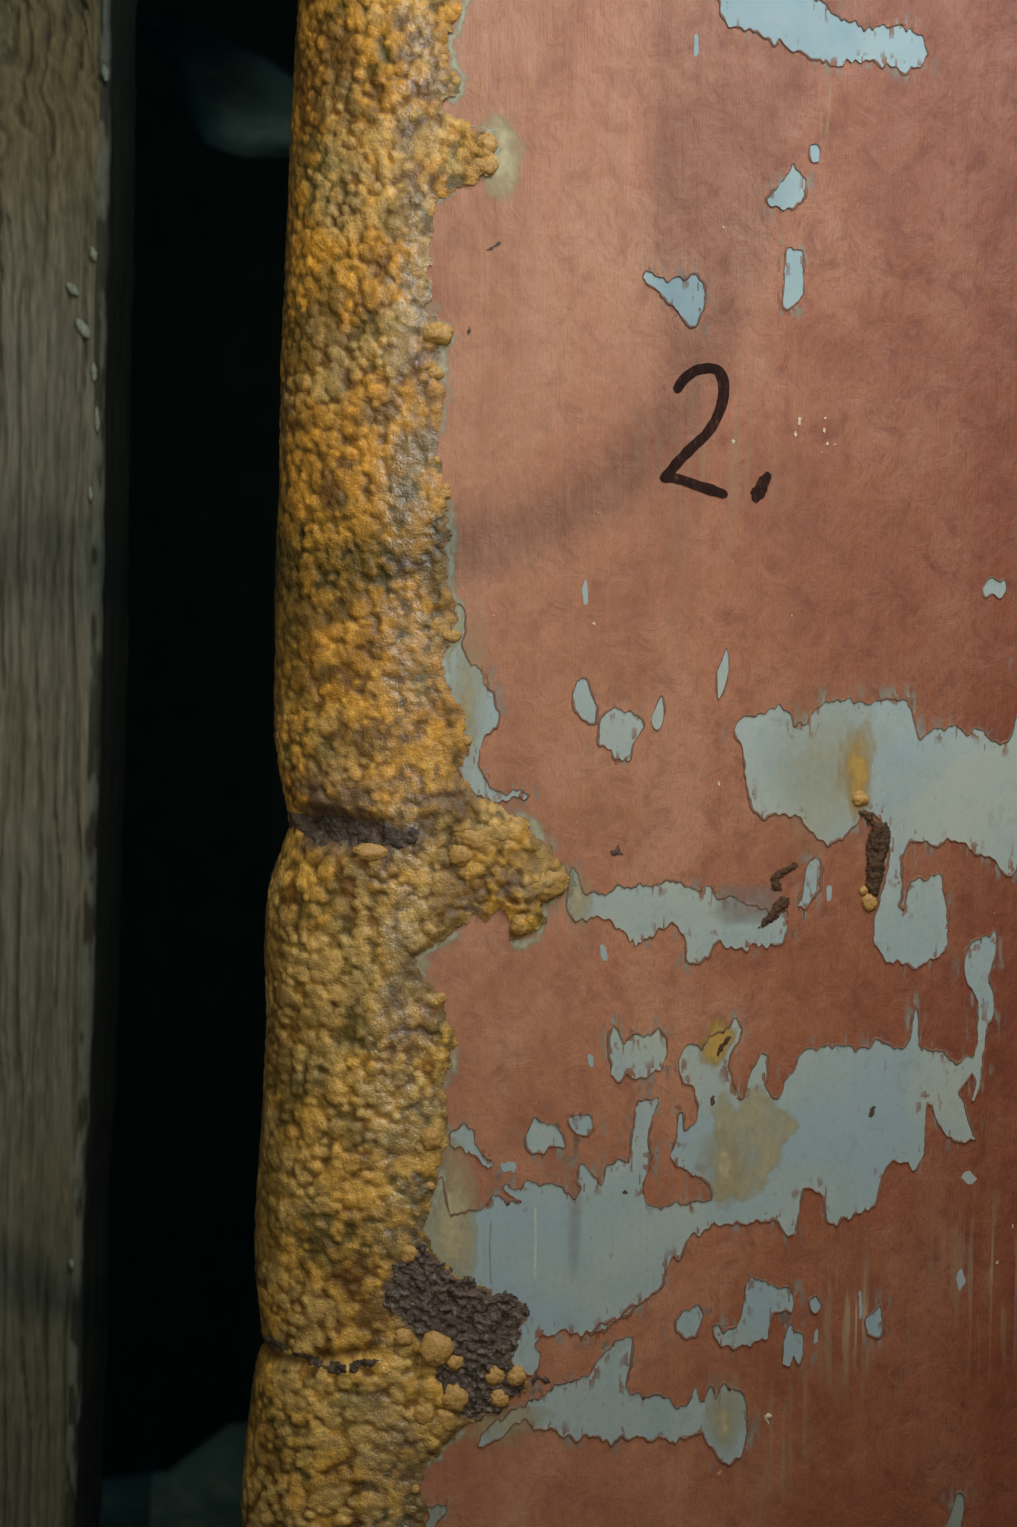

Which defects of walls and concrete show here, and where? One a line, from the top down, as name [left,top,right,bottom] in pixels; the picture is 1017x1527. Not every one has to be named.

peeling [448,0,471,103]
peeling [717,0,930,78]
peeling [642,266,709,329]
peeling [430,313,471,383]
peeling [981,576,1007,599]
peeling [438,505,553,845]
peeling [715,648,730,700]
peeling [571,677,666,765]
rust [240,0,589,1527]
rust [847,742,869,810]
peeling [416,691,1017,1477]
peeling [944,1490,966,1527]